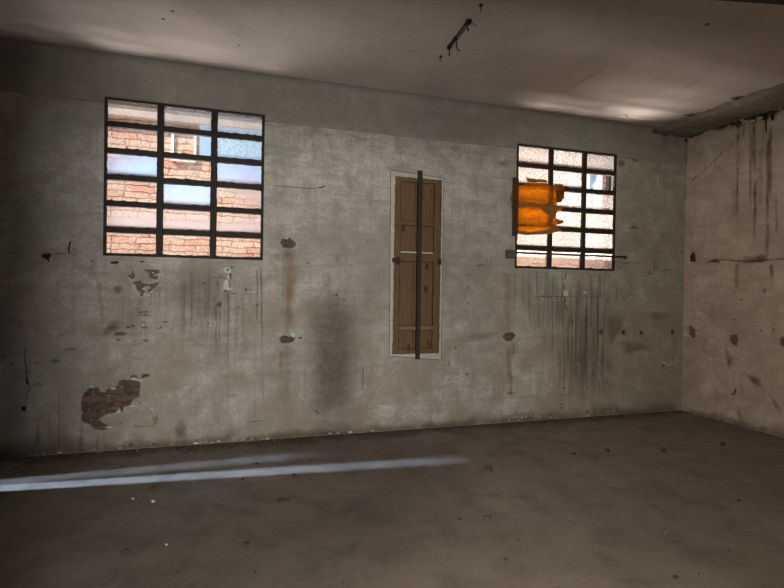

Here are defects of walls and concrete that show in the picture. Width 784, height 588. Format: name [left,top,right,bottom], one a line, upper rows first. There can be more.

spalling [279,236,298,249]
flaking render [126,261,161,298]
spalling [279,332,302,347]
spalling [77,374,153,432]